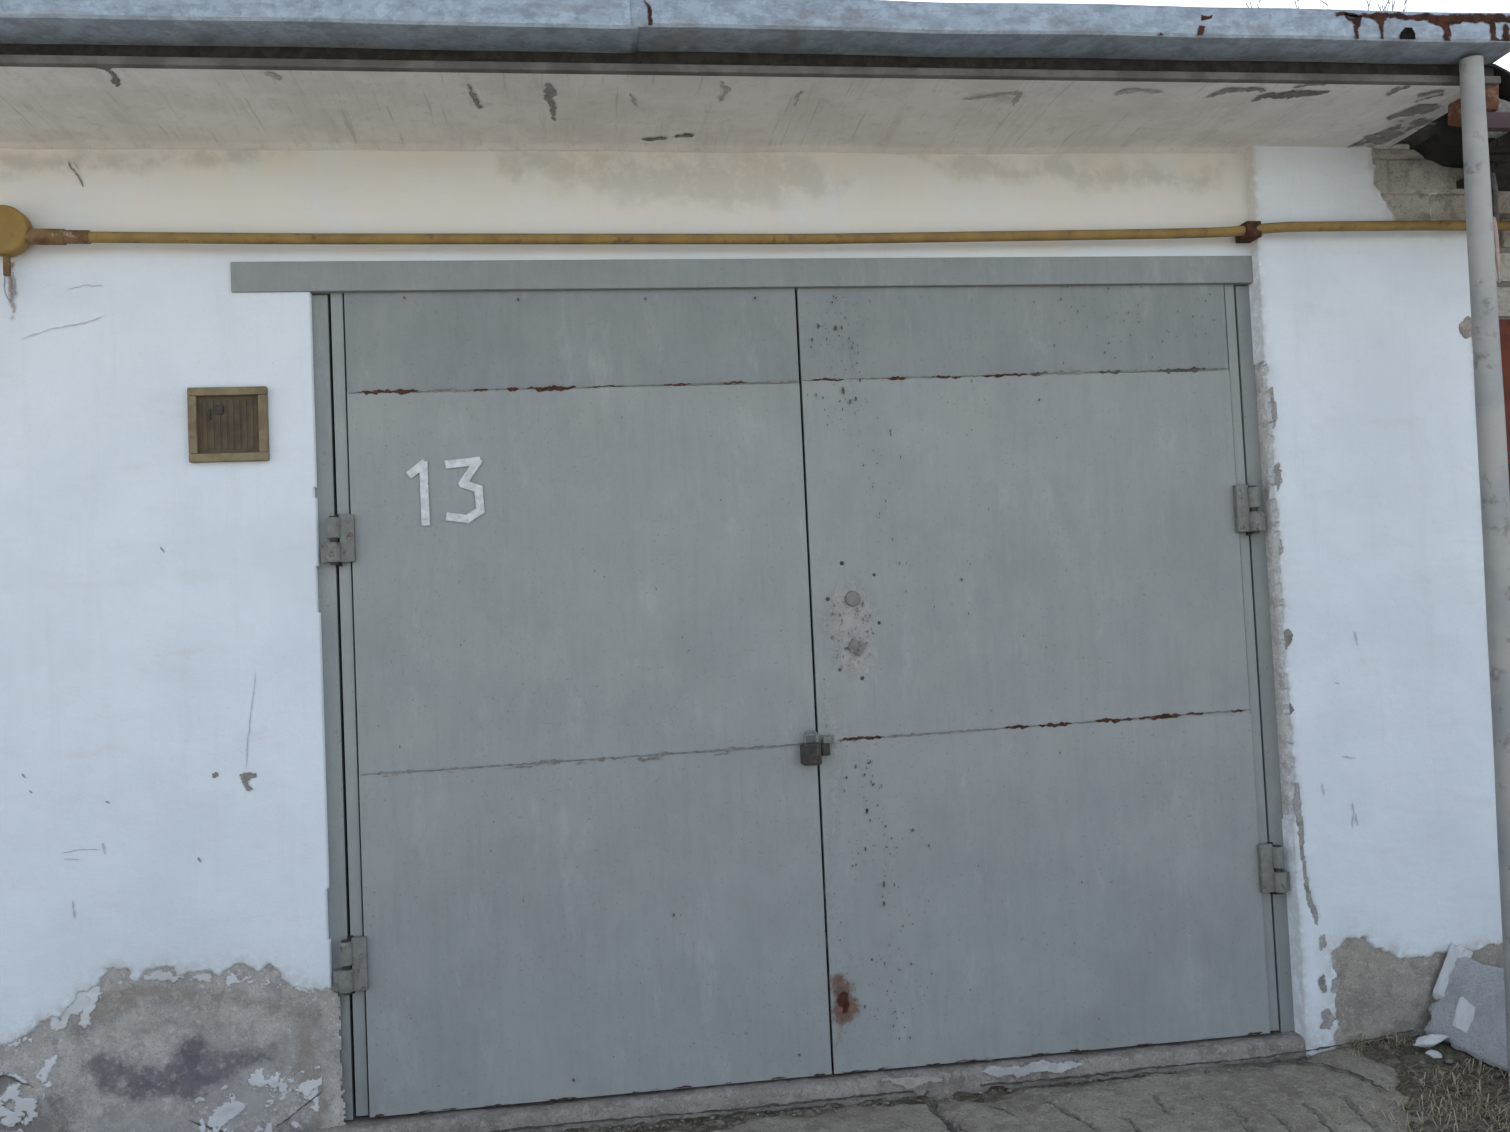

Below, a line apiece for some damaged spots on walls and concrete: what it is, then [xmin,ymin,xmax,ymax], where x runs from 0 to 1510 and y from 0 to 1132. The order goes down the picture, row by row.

corrosion [1336,12,1510,41]
corrosion [807,293,891,436]
peeling [1255,363,1447,1048]
corrosion [826,725,932,1040]
peeling [1471,944,1504,968]
peeling [0,964,346,1132]
leakage [91,1013,327,1132]